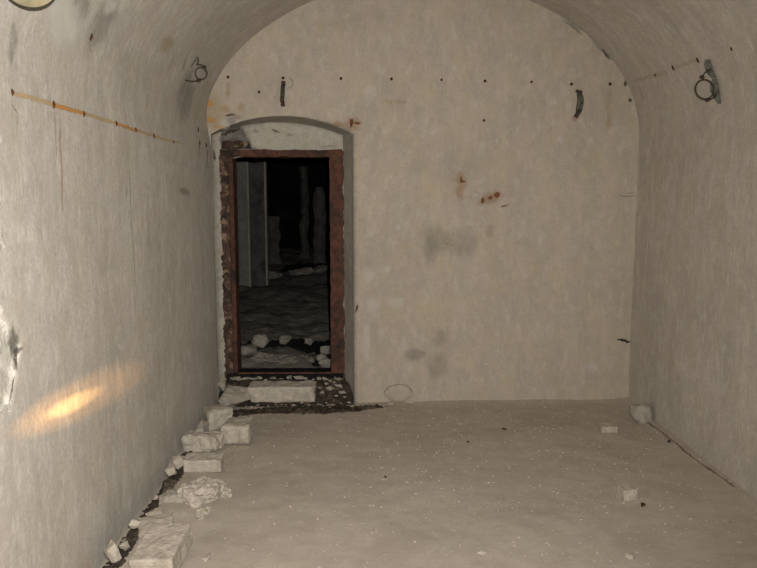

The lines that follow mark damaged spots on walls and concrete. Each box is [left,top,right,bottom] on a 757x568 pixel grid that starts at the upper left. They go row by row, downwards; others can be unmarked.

rust [16,93,178,143]
flaking render [0,300,20,413]